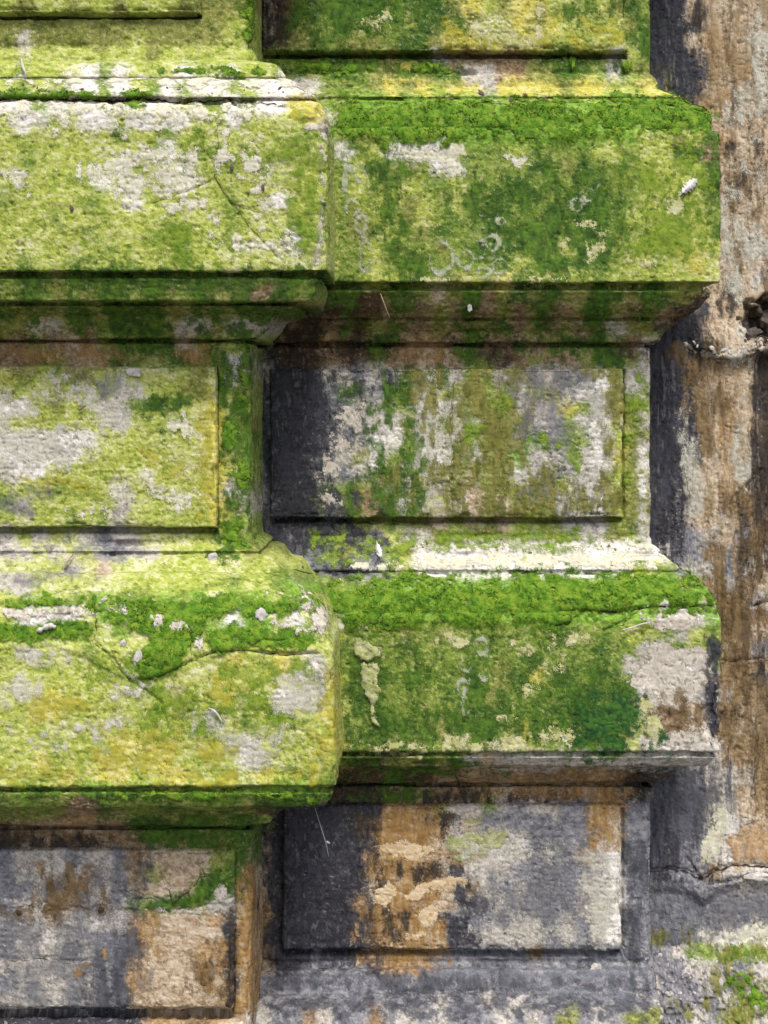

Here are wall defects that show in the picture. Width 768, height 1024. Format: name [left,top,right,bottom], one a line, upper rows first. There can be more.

crack [0,98,283,258]
leakage [0,0,768,610]
crack [94,611,316,725]
leakage [733,635,768,725]
leakage [0,852,151,1008]
leakage [173,907,236,1008]
leakage [241,759,732,1024]